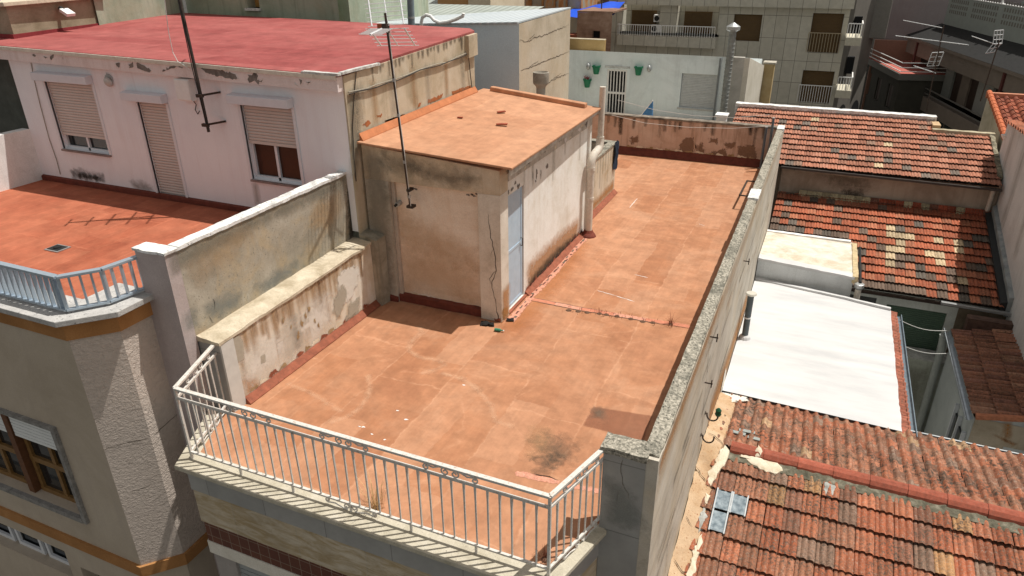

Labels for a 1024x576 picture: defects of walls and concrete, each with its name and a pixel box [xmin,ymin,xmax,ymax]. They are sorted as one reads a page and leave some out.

peeling [115,62,183,73]
peeling [201,68,264,85]
crack [521,28,570,83]
peeling [626,124,765,160]
crack [488,215,499,319]
leakage [529,224,578,286]
peeling [245,265,369,391]